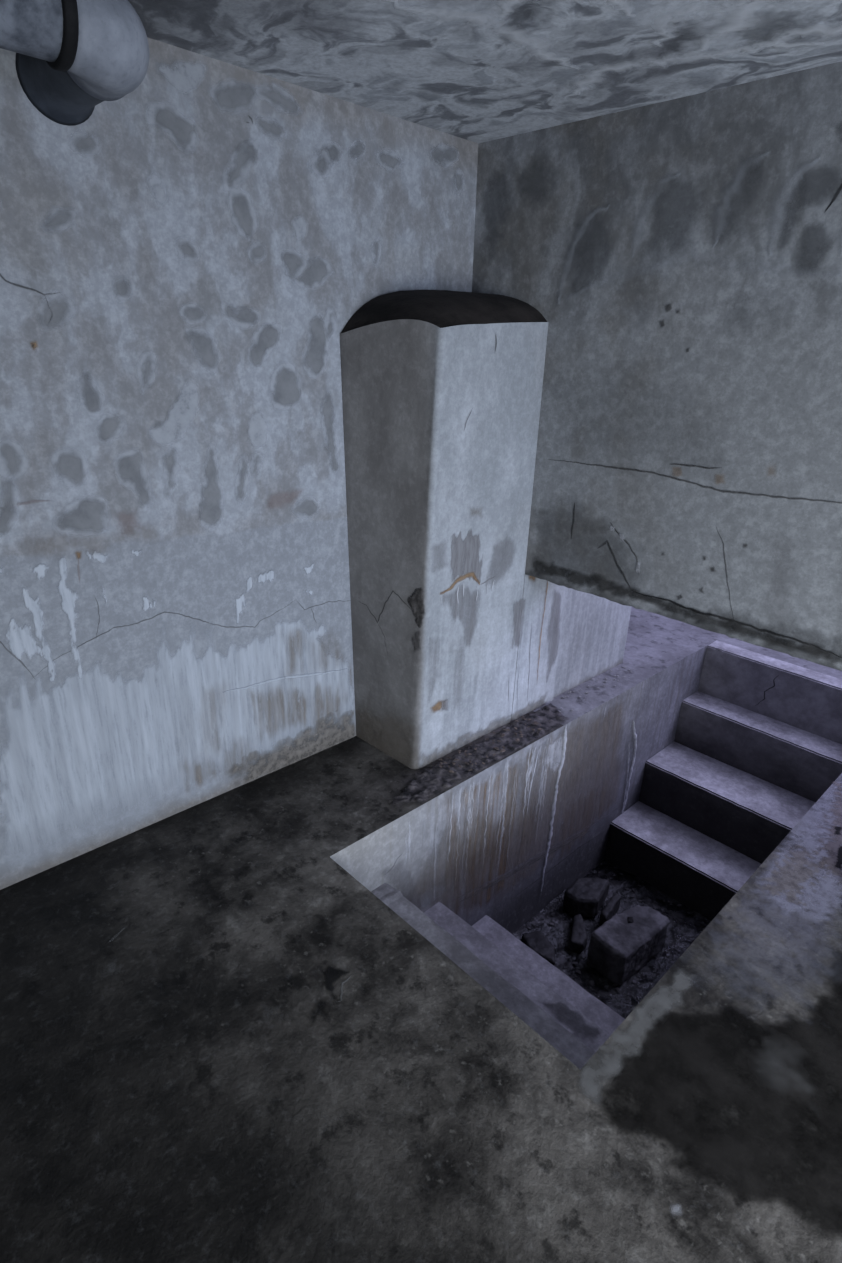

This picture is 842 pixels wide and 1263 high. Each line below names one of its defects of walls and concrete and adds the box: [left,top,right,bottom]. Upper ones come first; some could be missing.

crack [825,184,842,212]
crack [550,459,842,503]
crack [0,591,413,676]
corrosion [441,573,494,645]
crack [716,527,733,614]
peeling [0,557,353,846]
water stain [507,727,567,893]
water stain [601,960,842,1234]